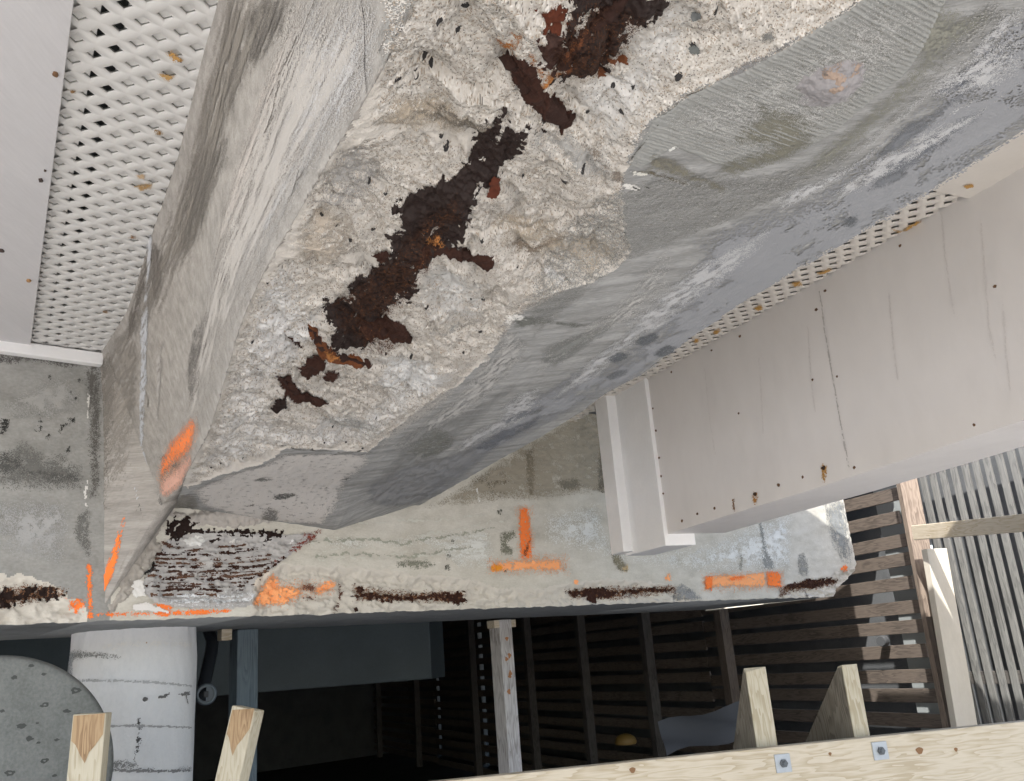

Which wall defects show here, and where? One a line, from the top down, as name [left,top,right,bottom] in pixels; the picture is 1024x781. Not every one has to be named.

corrosion [270,0,670,414]
spalling [183,0,855,489]
corrosion [0,583,69,609]
corrosion [145,515,321,597]
corrosion [333,583,467,614]
spalling [143,525,691,616]
corrosion [564,584,676,604]
corrosion [778,577,838,597]